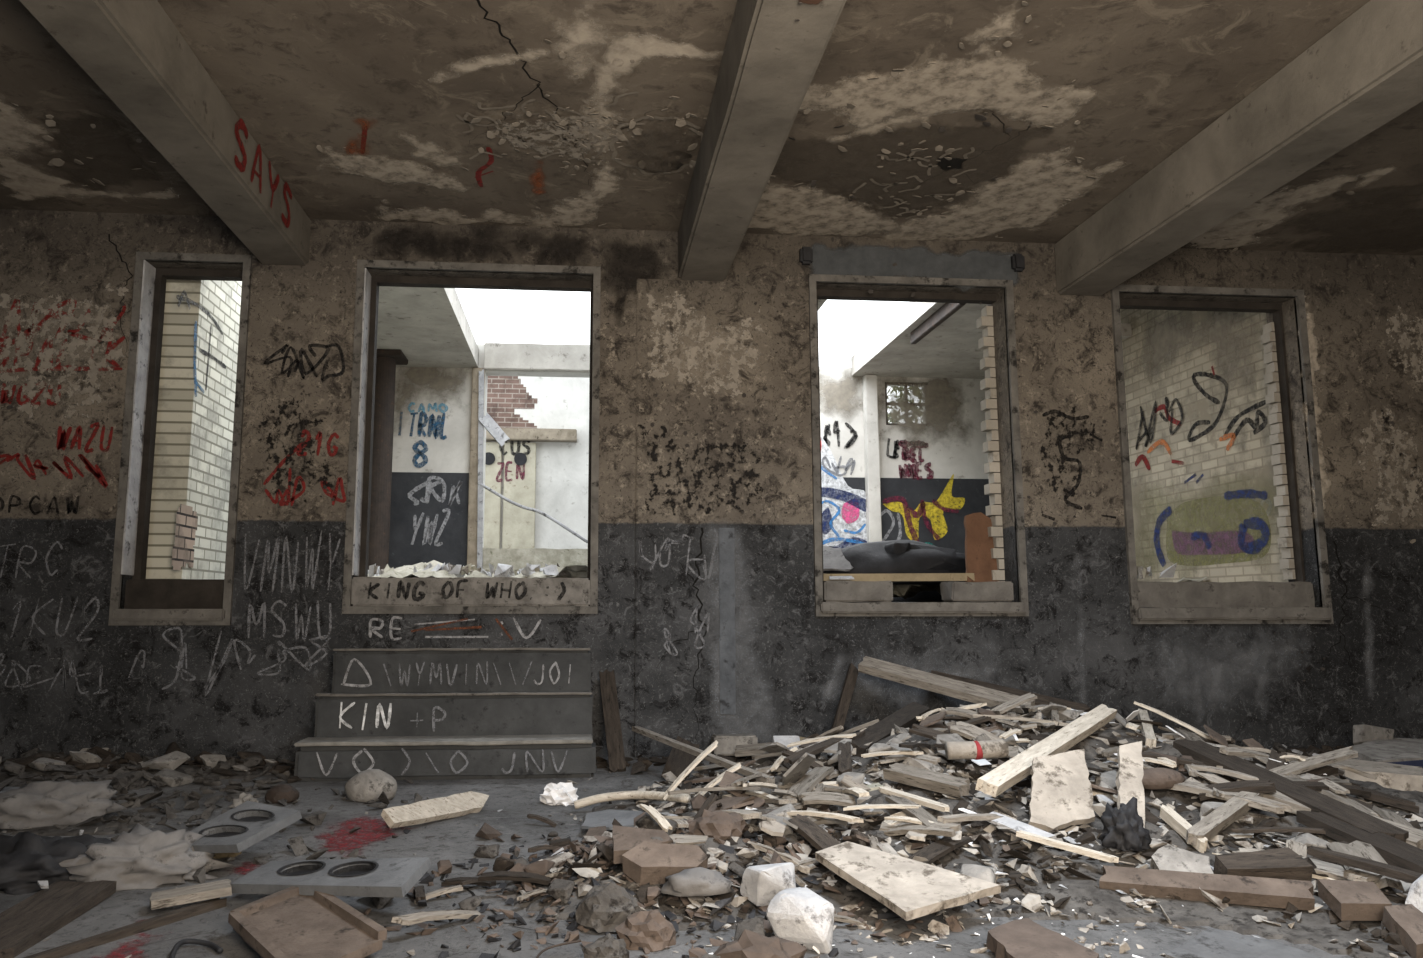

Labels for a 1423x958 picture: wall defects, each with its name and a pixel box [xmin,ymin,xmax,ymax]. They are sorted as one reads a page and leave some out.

peeling [0,102,176,200]
crack [469,0,654,188]